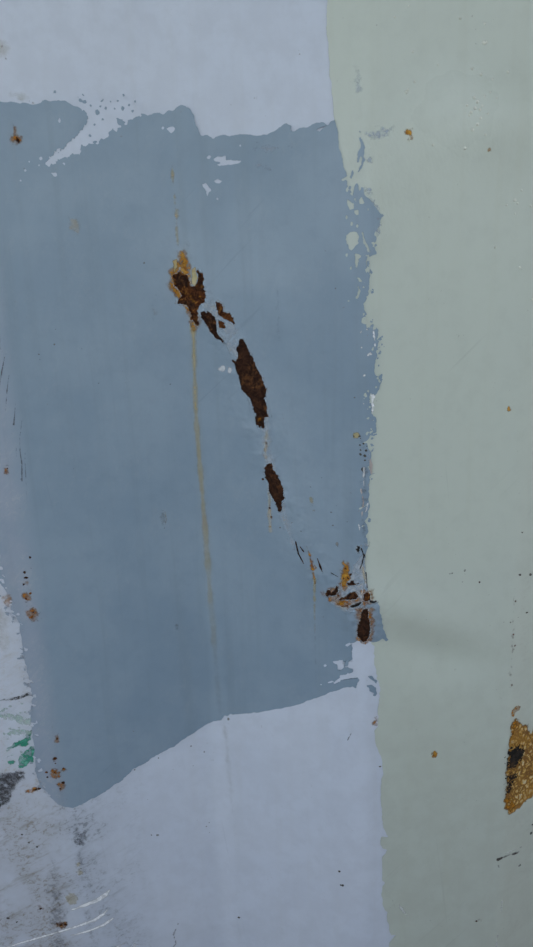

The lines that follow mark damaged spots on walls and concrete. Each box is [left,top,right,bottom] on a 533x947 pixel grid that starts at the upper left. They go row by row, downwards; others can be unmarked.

peeling [20,94,144,181]
peeling [207,155,241,166]
rust [169,251,206,366]
peeling [342,176,385,530]
rust [295,541,377,644]
peeling [320,641,380,699]
rust [503,706,533,815]